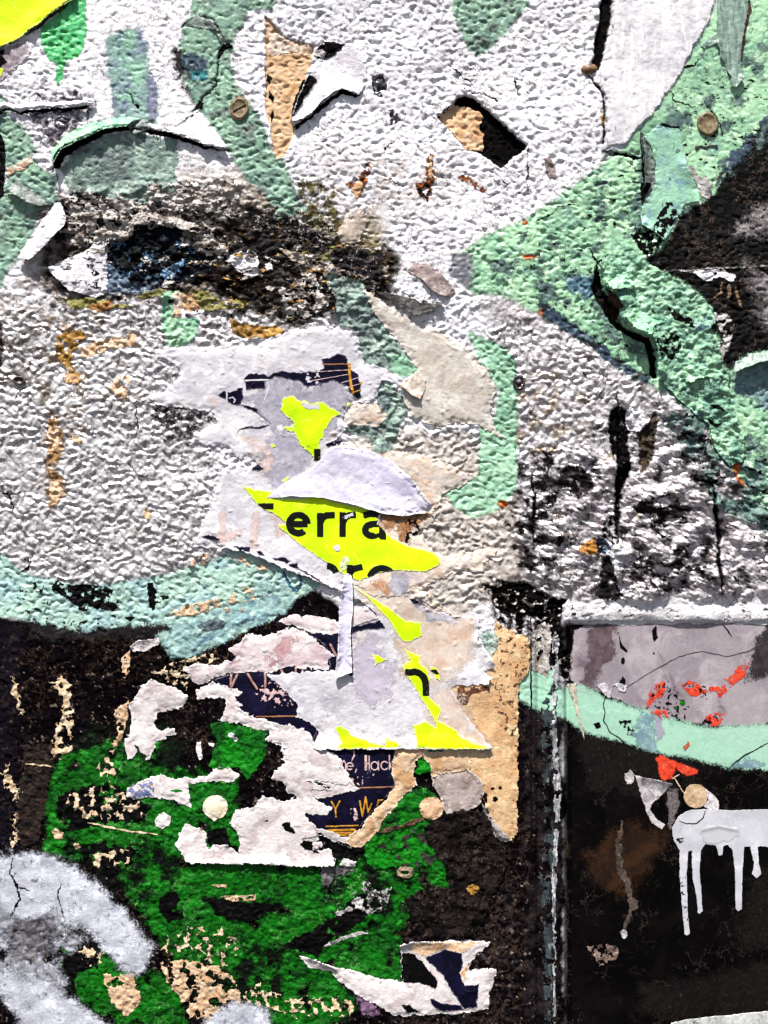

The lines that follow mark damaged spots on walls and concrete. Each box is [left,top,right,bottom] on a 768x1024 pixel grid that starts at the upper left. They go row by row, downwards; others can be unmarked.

crack [588,0,641,160]
spalling [438,96,526,168]
rust [346,162,372,199]
rust [415,153,436,202]
peeling [185,551,270,573]
peeling [147,580,281,617]
peeling [478,630,499,657]
spalling [485,582,572,681]
peeling [121,651,131,680]
peeling [151,653,219,691]